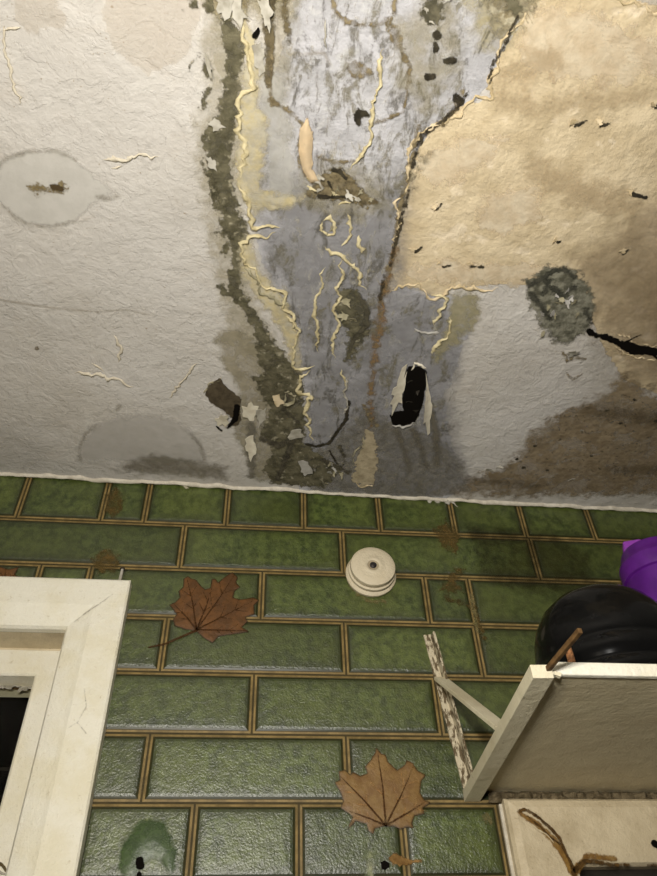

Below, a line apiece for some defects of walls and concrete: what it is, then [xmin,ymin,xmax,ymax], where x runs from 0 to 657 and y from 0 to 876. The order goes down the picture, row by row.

hole [203,378,259,478]
leakage [189,0,657,500]
peeling [253,0,657,507]
crack [586,329,657,361]